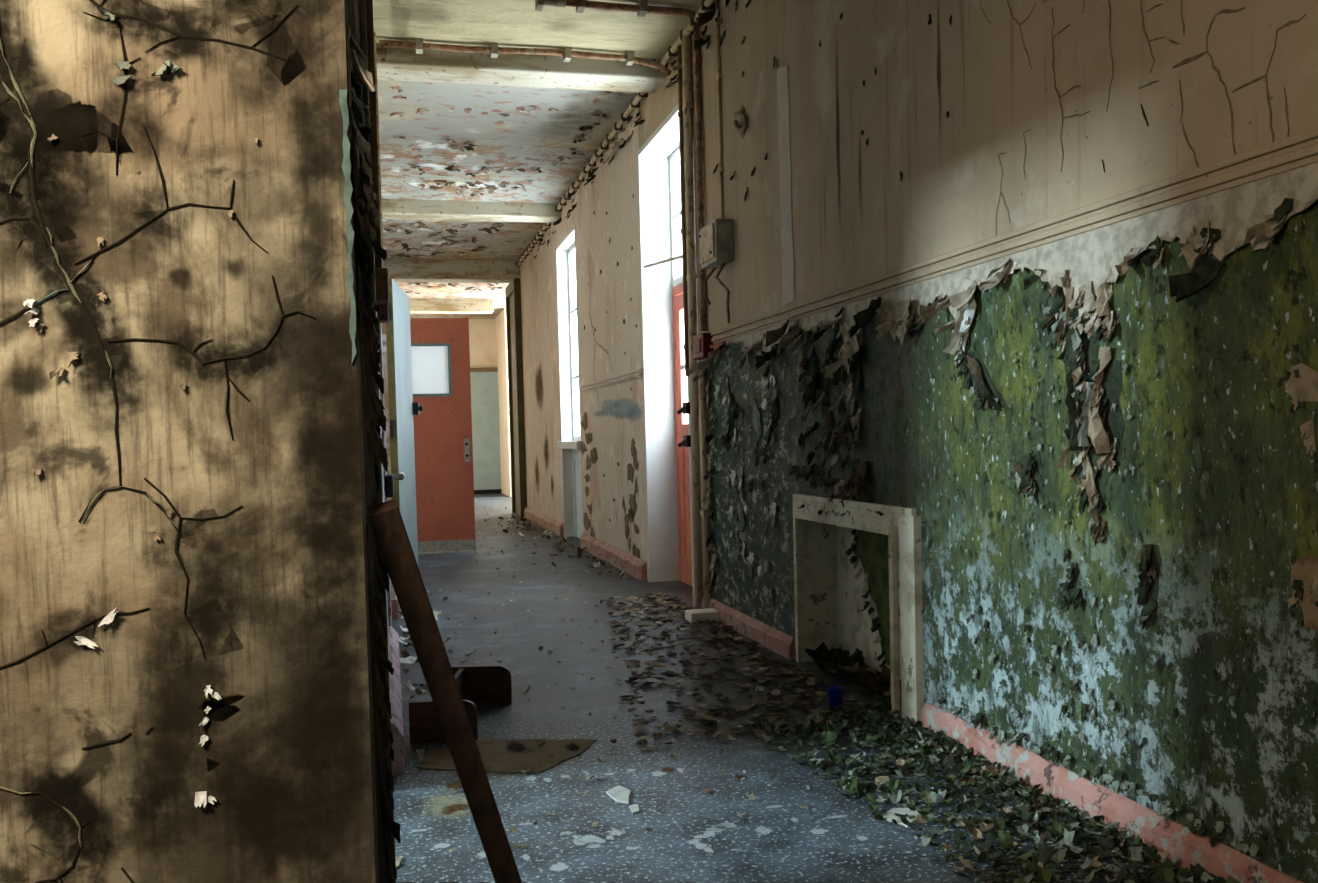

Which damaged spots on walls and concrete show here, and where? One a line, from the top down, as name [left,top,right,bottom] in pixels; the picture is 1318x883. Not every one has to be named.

leakage [9,90,105,214]
peeling [394,91,612,198]
crack [979,0,1306,236]
leakage [14,371,46,392]
crack [0,0,315,659]
leakage [172,270,189,287]
peeling [339,26,504,883]
peeling [581,412,605,538]
peeling [609,438,640,558]
peeling [684,162,1318,680]
crack [0,607,150,669]
leakage [129,528,267,844]